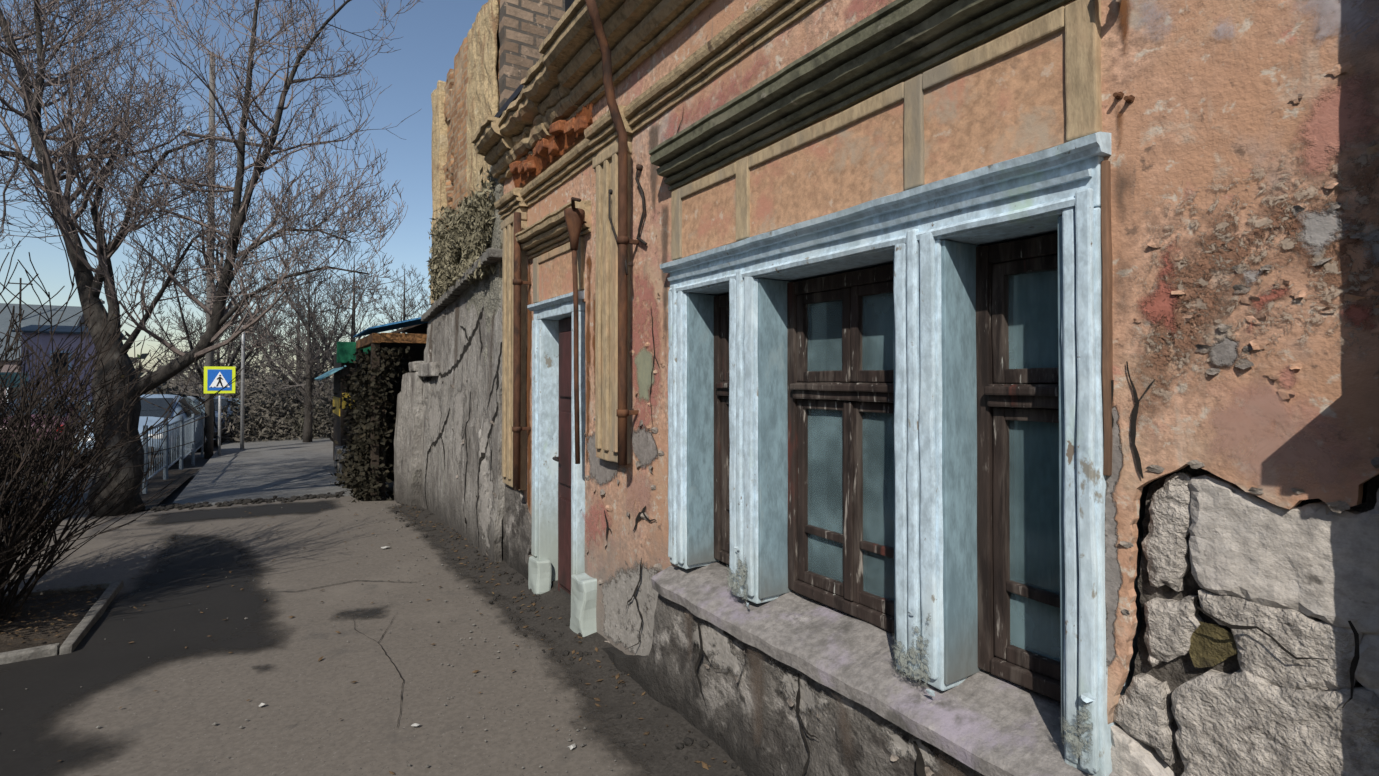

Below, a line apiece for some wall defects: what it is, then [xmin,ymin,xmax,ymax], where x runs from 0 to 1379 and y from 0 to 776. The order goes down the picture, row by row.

spalling [509,102,594,188]
crack [422,306,502,536]
rust [586,257,595,462]
crack [1111,361,1155,479]
spalling [1063,61,1379,776]
spalling [598,560,663,656]
crack [694,621,720,706]
crack [795,673,818,776]